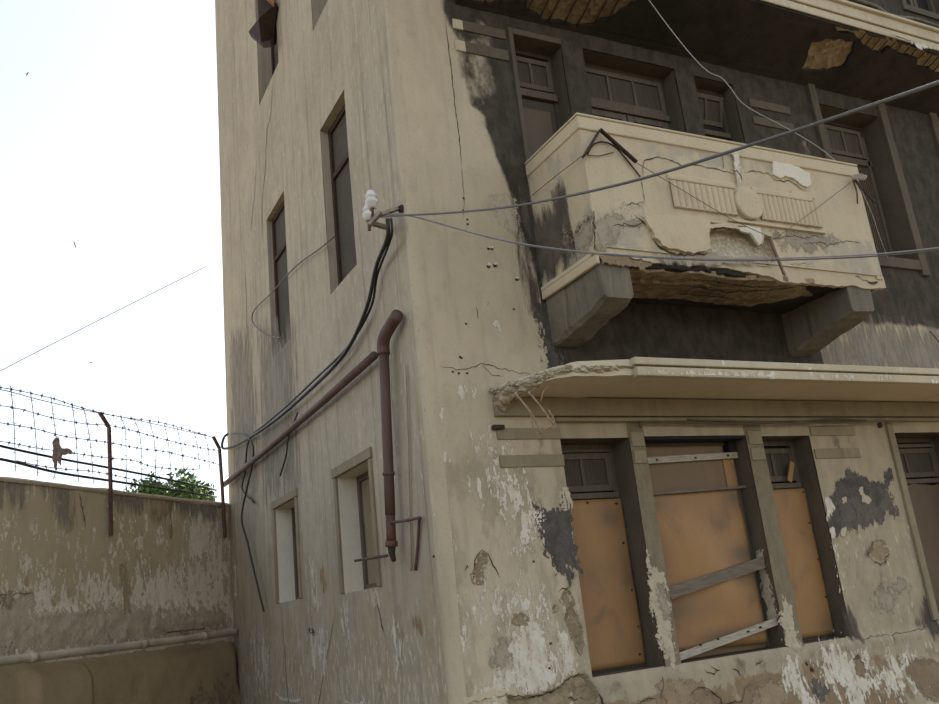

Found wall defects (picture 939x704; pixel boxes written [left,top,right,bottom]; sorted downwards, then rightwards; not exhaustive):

spalling [526,0,635,27]
spalling [802,27,939,72]
crack [446,28,465,217]
crack [563,156,734,272]
peeling [594,202,754,270]
spalling [710,222,763,246]
spalling [452,364,774,434]
peeling [814,373,893,381]
spalling [0,481,233,667]
peeling [457,424,604,704]
peeling [637,538,939,704]
peeling [824,496,847,593]